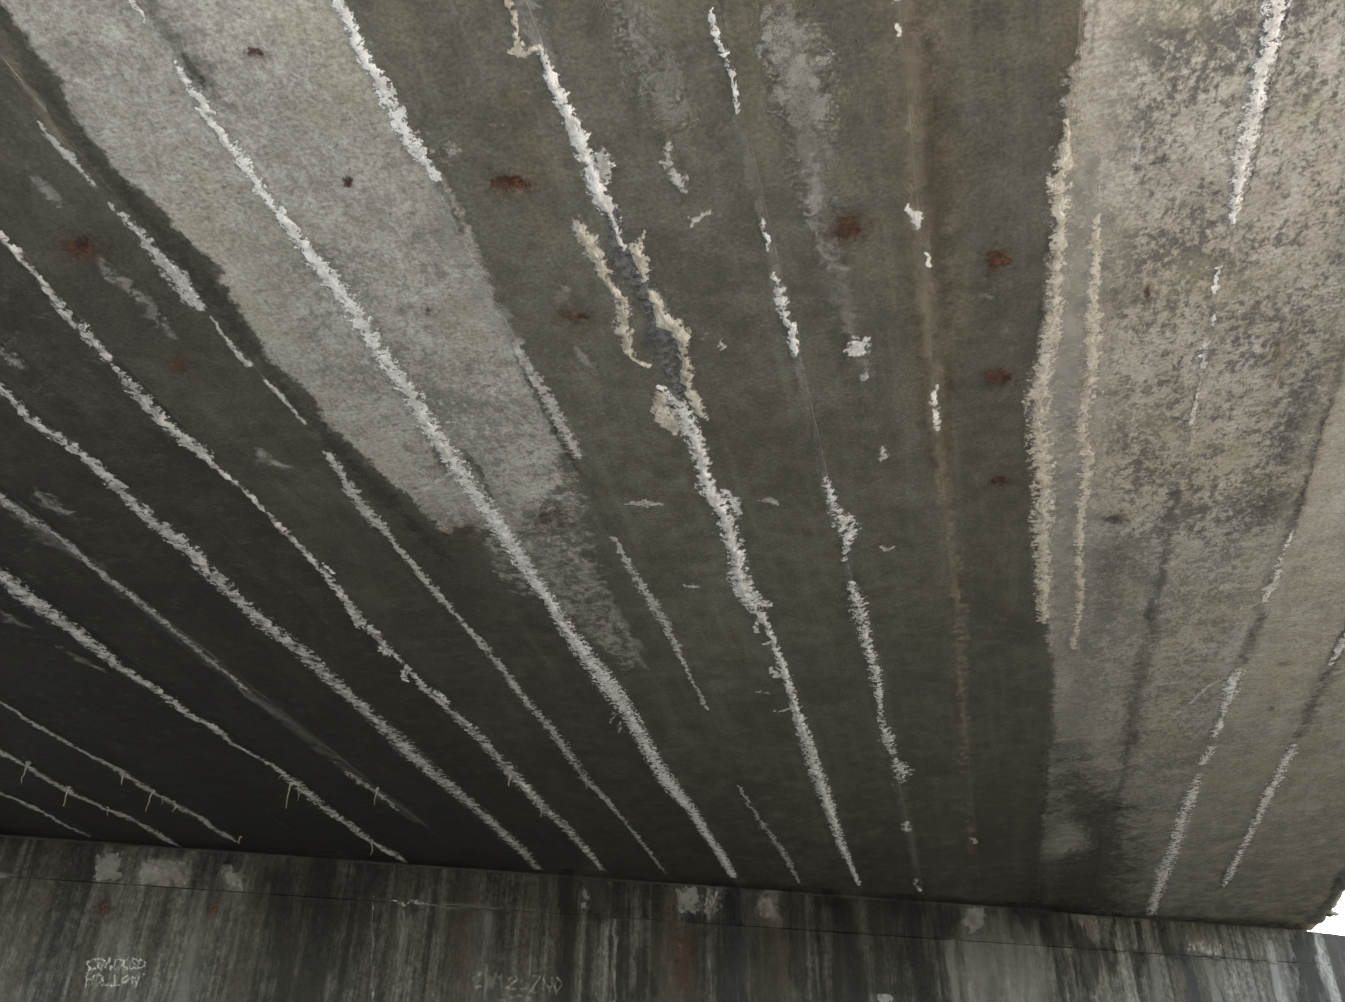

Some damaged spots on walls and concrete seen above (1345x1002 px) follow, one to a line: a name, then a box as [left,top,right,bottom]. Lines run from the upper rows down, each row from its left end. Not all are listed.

efflorescence [35,118,96,187]
efflorescence [330,0,442,182]
corrosion [490,175,531,190]
efflorescence [1225,0,1293,225]
efflorescence [108,202,254,367]
damp [1021,68,1126,661]
damp [0,230,611,1002]
damp [174,60,749,1002]
efflorescence [847,580,914,783]
damp [898,667,1247,1002]
efflorescence [1222,744,1298,887]
damp [1266,924,1339,1002]